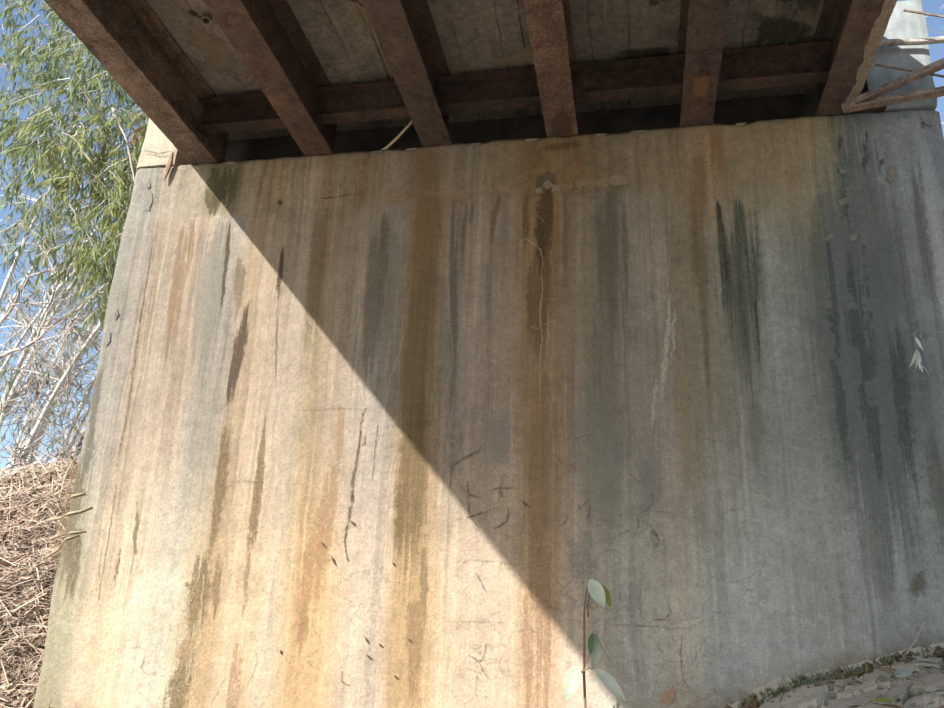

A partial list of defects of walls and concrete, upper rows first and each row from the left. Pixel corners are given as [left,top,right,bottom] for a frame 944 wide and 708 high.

water stain [163,219,249,708]
crack [294,406,528,531]
water stain [697,198,769,476]
water stain [783,117,944,611]